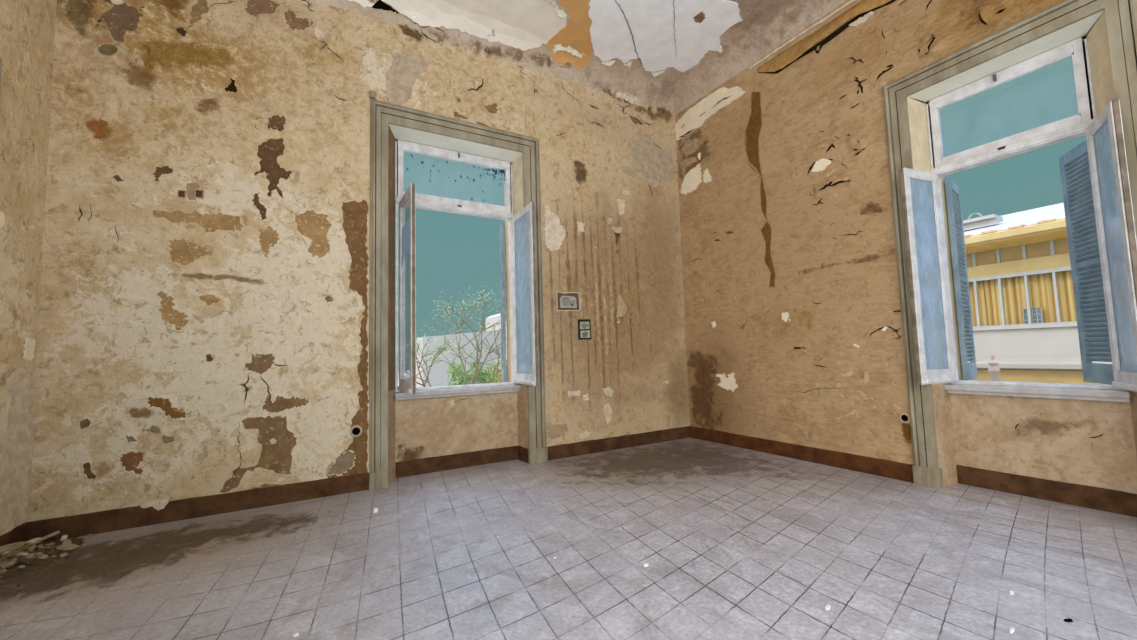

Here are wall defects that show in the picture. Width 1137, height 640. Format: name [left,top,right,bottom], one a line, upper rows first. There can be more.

spalling [92,0,149,59]
peeling [348,0,743,77]
peeling [675,86,747,195]
damp [746,92,775,287]
peeling [811,158,831,172]
spalling [142,112,370,494]
peeling [716,372,737,392]